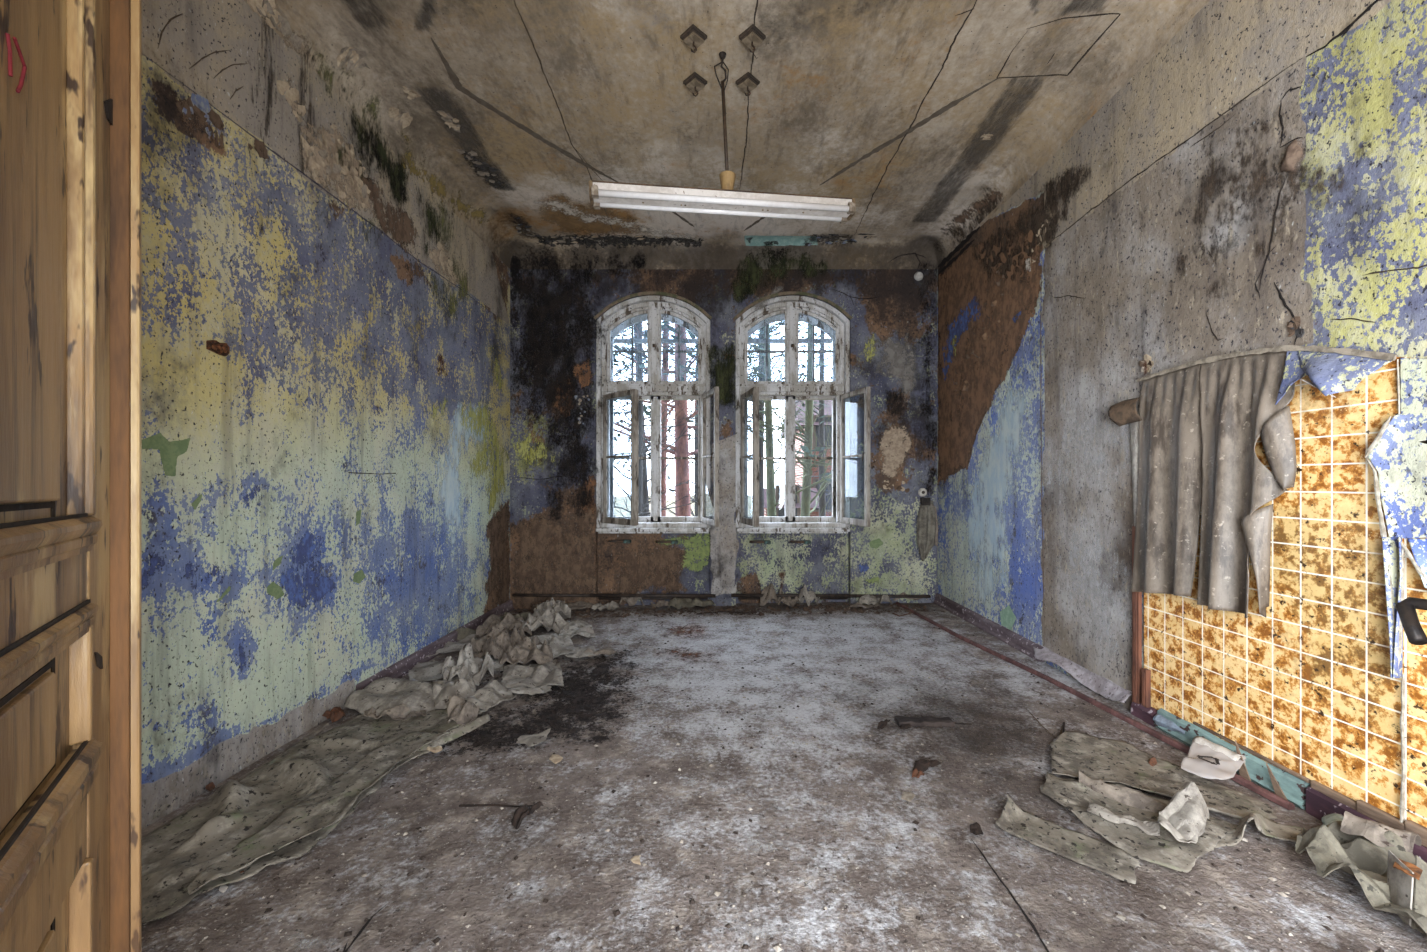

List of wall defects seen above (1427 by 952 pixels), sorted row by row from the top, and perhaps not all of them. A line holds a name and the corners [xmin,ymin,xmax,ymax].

spalling [277,78,459,287]
crack [514,0,626,272]
damp [536,195,693,239]
crack [739,0,758,189]
crack [856,0,977,232]
damp [1177,122,1344,276]
peeling [142,433,190,476]
spalling [206,340,230,356]
damp [433,399,509,544]
damp [490,246,646,519]
spalling [880,219,1049,561]
spalling [1193,721,1427,848]